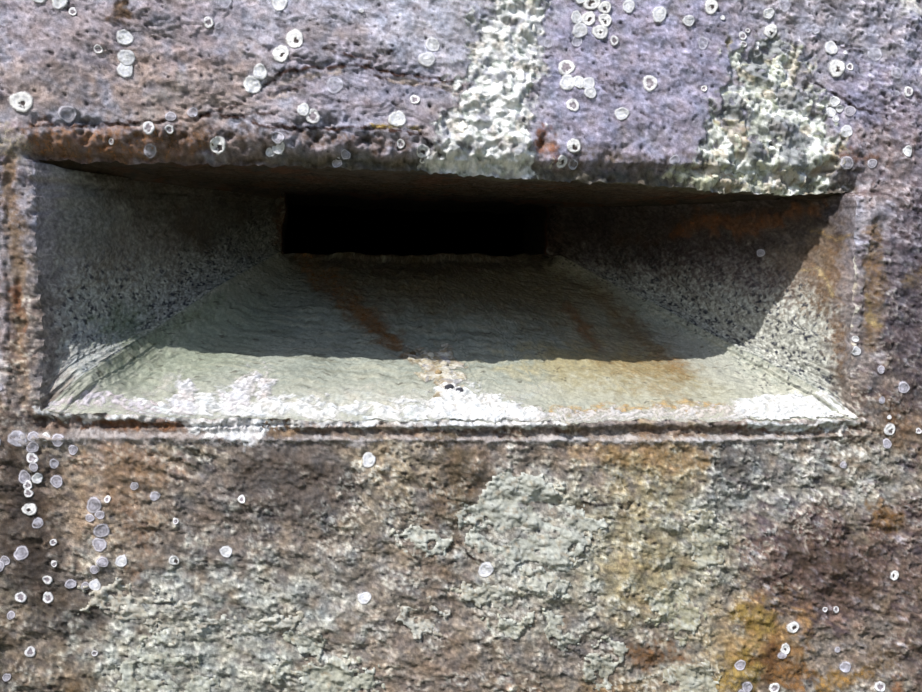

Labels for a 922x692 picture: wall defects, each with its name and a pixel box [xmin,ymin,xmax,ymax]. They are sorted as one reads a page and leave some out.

rust [21,123,216,165]
leakage [63,330,116,381]
leakage [33,361,858,509]
rust [715,604,883,692]